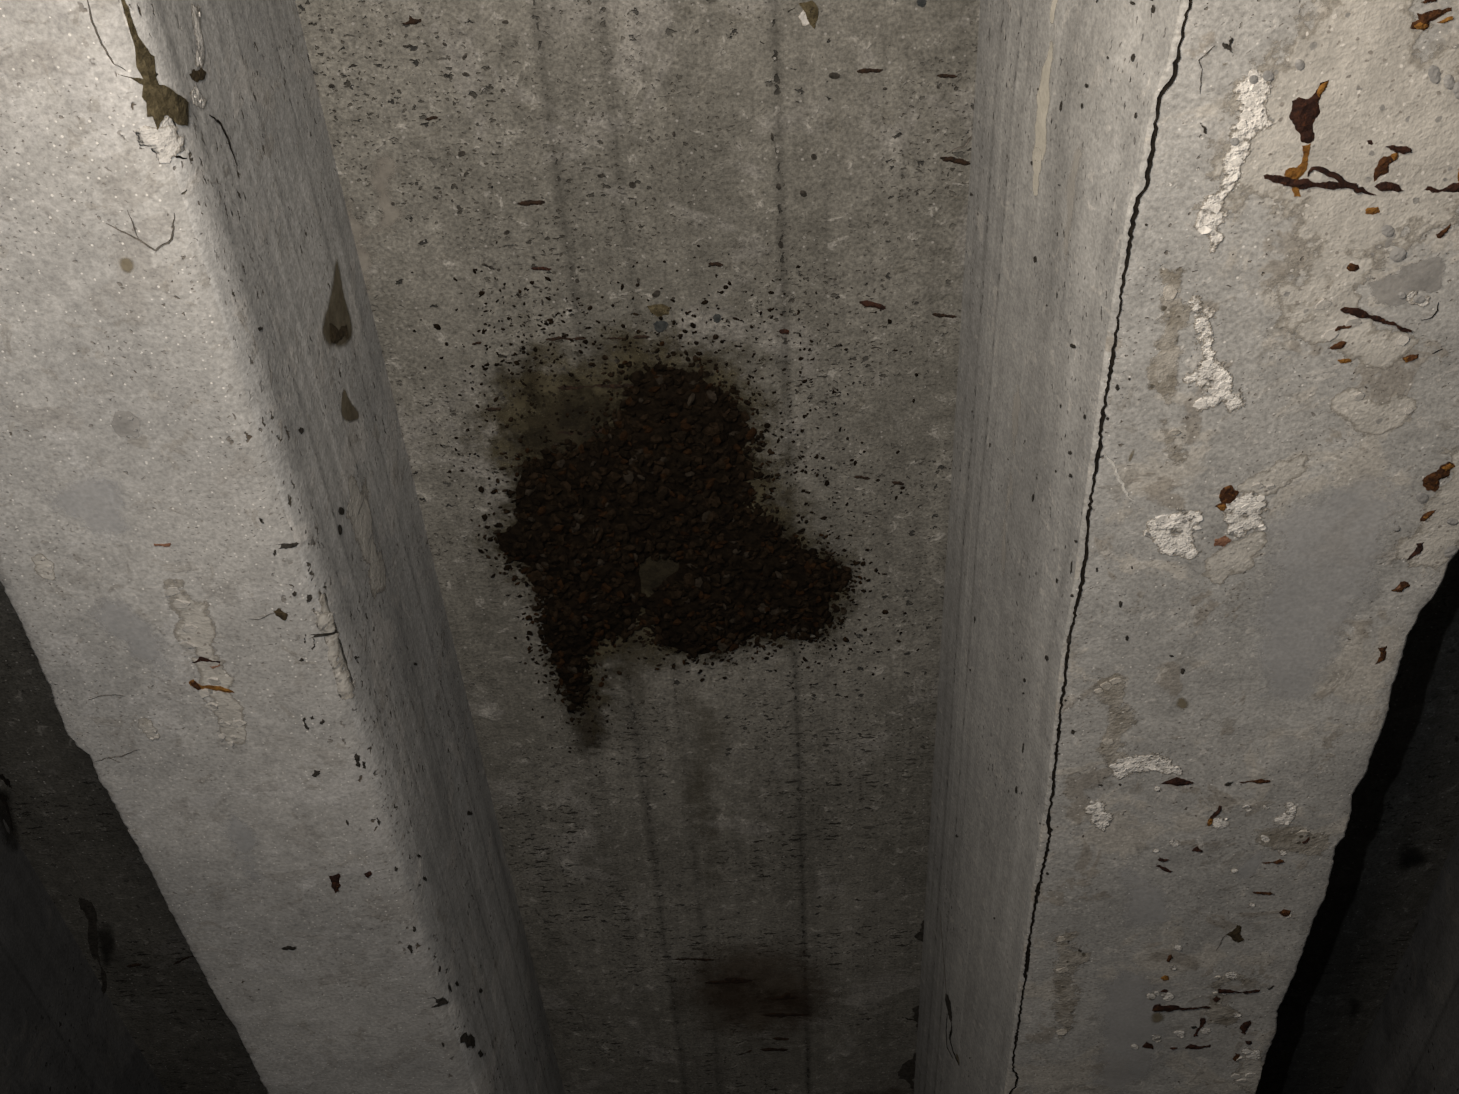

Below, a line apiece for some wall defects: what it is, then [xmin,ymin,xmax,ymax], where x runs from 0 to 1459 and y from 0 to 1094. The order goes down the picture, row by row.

rust [1410,0,1453,31]
spalling [118,0,206,164]
rust [1284,80,1329,197]
rust [1365,140,1412,215]
rust [1425,169,1459,193]
damp [480,332,857,636]
crack [1009,0,1214,1094]
damp [550,554,788,732]
crack [0,774,16,846]